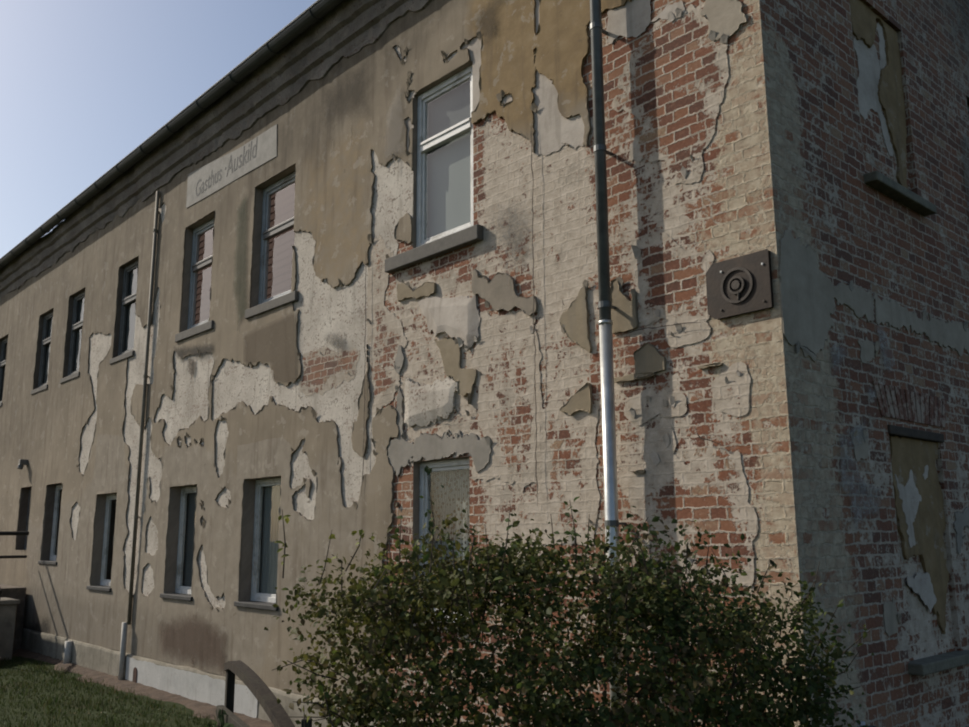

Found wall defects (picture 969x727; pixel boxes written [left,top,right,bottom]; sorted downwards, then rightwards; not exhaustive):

flaking render [530,71,584,156]
flaking render [606,0,729,184]
flaking render [853,22,893,157]
flaking render [616,231,714,347]
flaking render [71,502,81,540]
flaking render [79,332,112,475]
flaking render [124,118,414,596]
flaking render [465,300,600,547]
flaking render [624,388,758,587]
flaking render [711,362,751,417]
flaking render [895,465,928,548]
flaking render [907,572,937,613]